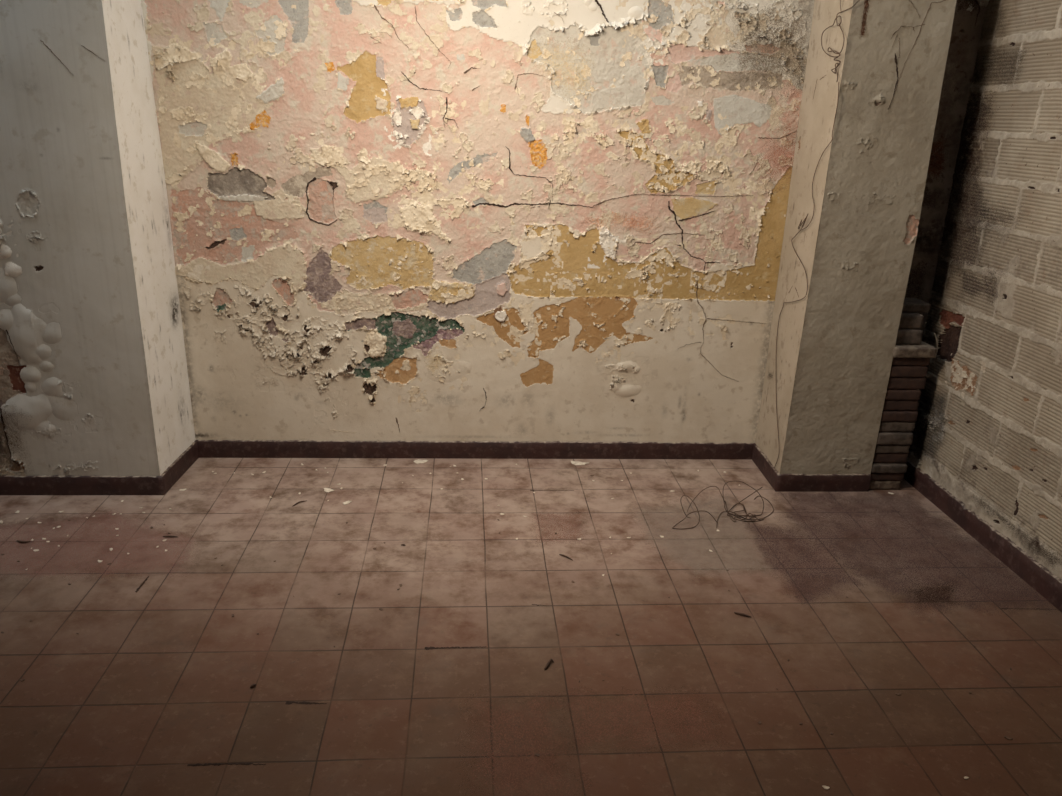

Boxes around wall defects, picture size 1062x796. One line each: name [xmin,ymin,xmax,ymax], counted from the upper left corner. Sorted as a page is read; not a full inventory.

corrosion [860,0,870,38]
peeling [0,328,23,408]
peeling [144,0,811,402]
crack [472,147,767,382]
water stain [910,385,950,464]
water stain [905,0,1027,314]